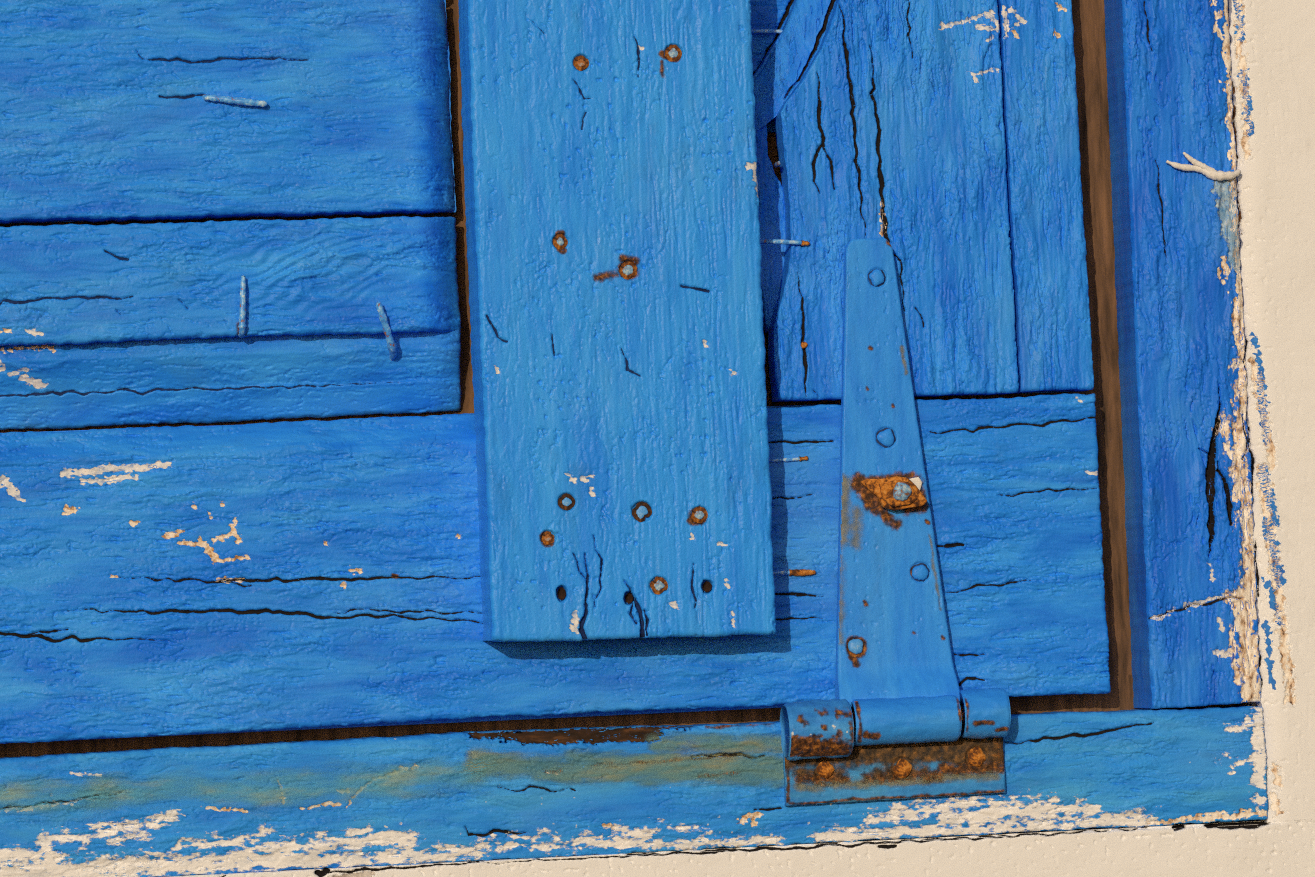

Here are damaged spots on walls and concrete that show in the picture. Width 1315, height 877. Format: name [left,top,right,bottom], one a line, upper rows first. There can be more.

crack [753,0,794,74]
crack [785,0,924,328]
corrosion [594,255,639,281]
peeling [0,328,56,389]
peeling [807,0,1296,843]
peeling [60,461,172,486]
crack [1148,336,1259,620]
peeling [162,503,250,584]
corrosion [840,472,938,592]
crack [0,575,483,643]
corrosion [785,699,1008,804]
peeling [0,809,785,877]